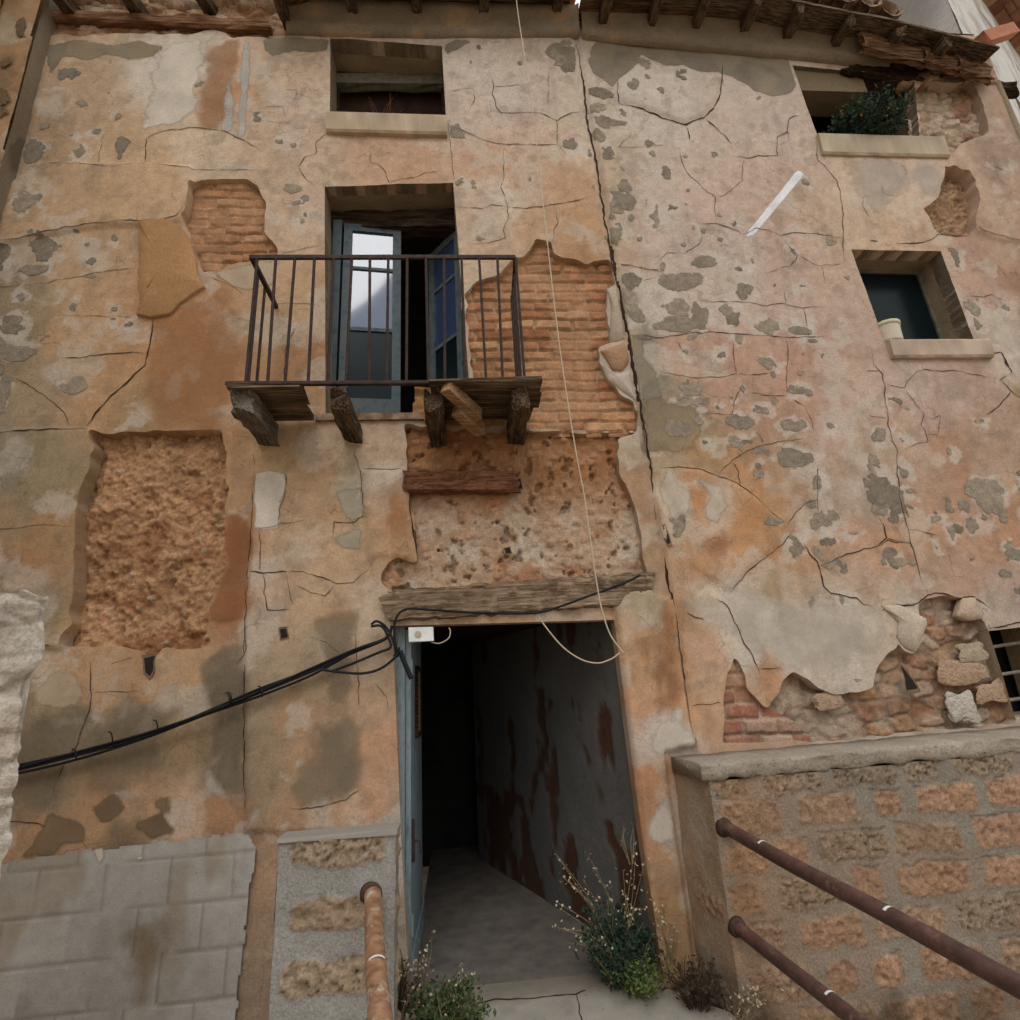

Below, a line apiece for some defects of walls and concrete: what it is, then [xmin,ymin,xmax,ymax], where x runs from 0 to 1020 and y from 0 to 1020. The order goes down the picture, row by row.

crack [42,127,254,170]
flaking render [186,183,279,289]
flaking render [917,166,971,267]
crack [0,320,153,433]
flaking render [382,244,743,590]
crack [370,47,1020,740]
flaking render [73,435,229,680]
leakage [202,648,243,786]
crack [236,455,369,809]
leakage [294,725,357,801]
leakage [316,614,355,698]
flaking render [703,595,1005,743]